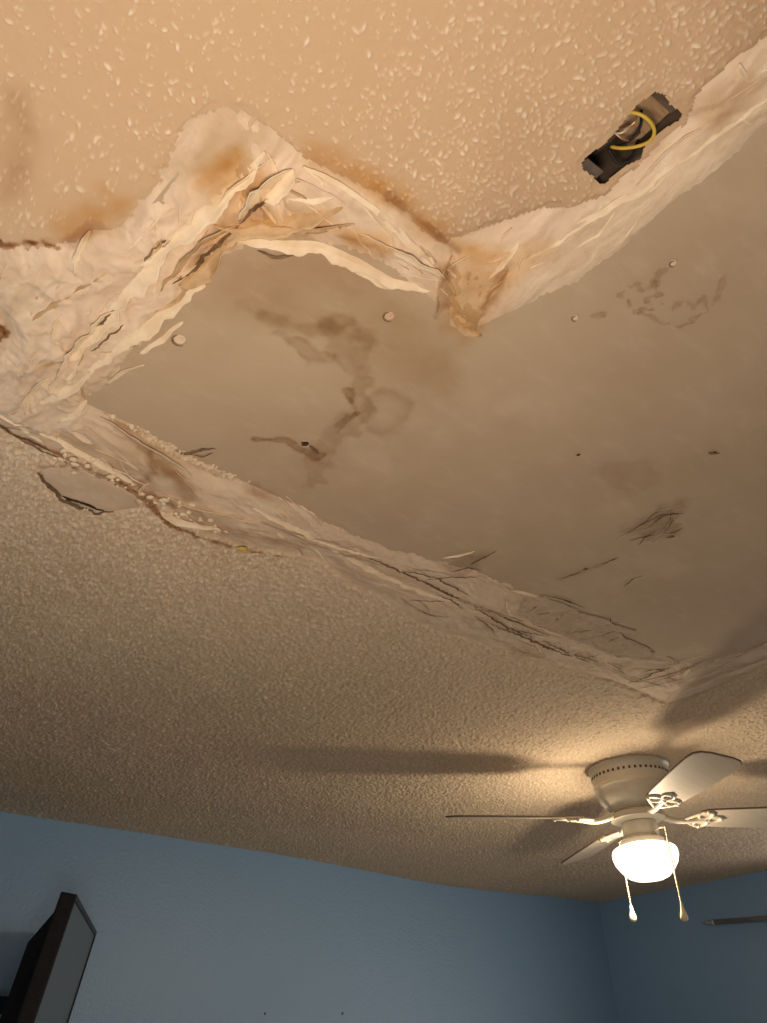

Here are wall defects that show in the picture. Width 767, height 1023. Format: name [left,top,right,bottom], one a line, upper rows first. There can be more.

peeling [30,151,456,422]
spalling [37,465,139,515]
peeling [517,595,655,660]